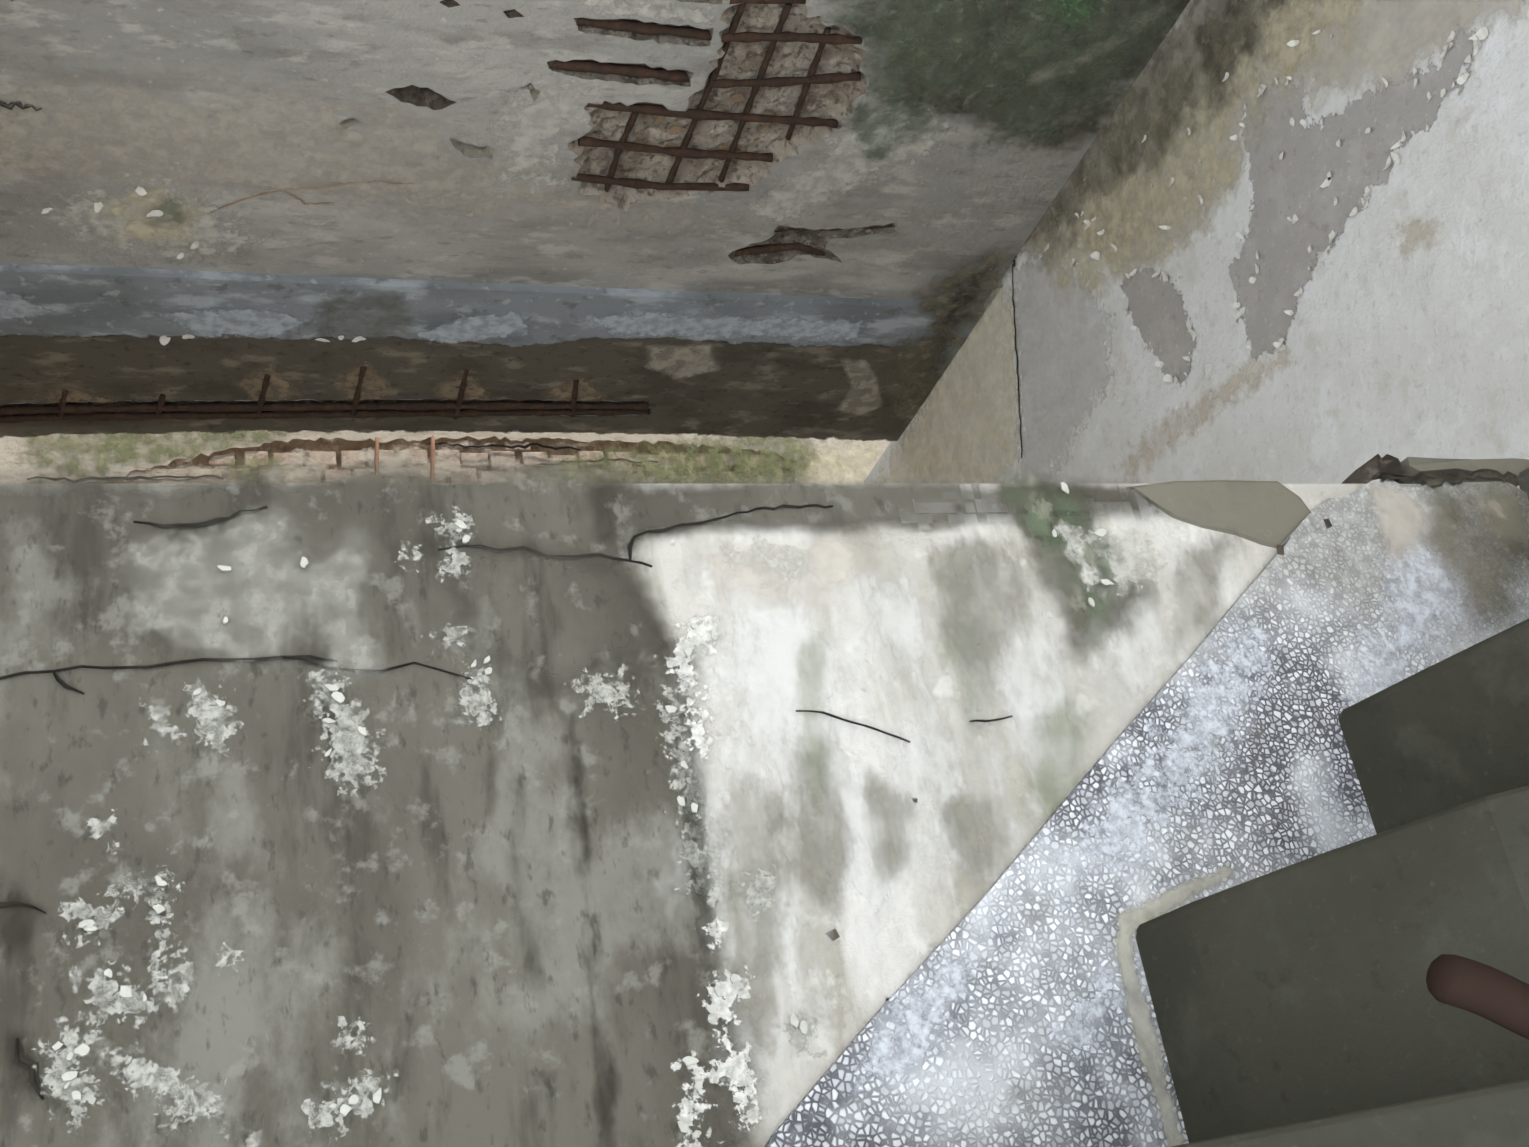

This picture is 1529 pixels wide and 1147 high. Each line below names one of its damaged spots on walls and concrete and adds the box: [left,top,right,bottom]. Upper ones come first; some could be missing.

spalling [547,0,867,211]
spalling [728,223,898,264]
peeling [1121,267,1196,387]
damp [1021,0,1520,289]
peeling [1228,24,1489,362]
crack [133,506,268,528]
crack [0,655,472,695]
damp [0,249,1072,1147]
crack [438,504,833,568]
damp [1055,483,1162,692]
damp [1061,624,1273,867]
damp [1342,489,1479,703]